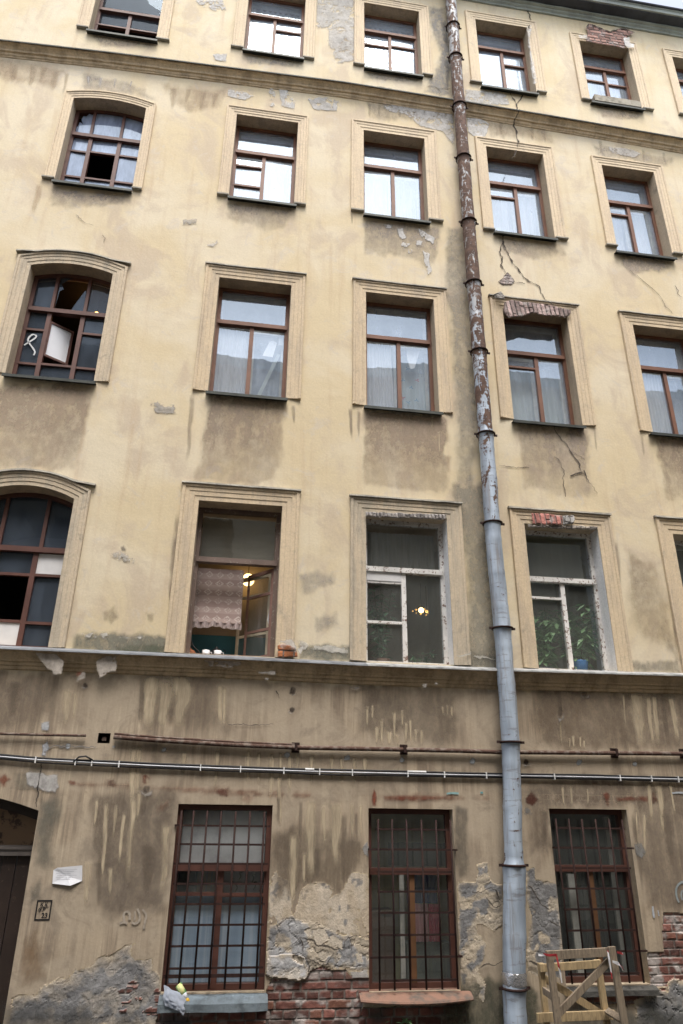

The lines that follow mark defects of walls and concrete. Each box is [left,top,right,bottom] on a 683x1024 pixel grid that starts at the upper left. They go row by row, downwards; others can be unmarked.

flaking render [579,24,635,48]
crack [510,93,523,157]
crack [499,235,554,305]
flaking render [494,272,571,318]
damp [204,395,284,451]
damp [366,223,495,667]
crack [554,427,597,497]
damp [94,750,174,912]
damp [274,803,362,896]
spalling [10,872,469,1024]
spalling [457,863,503,1002]
spalling [526,867,563,978]